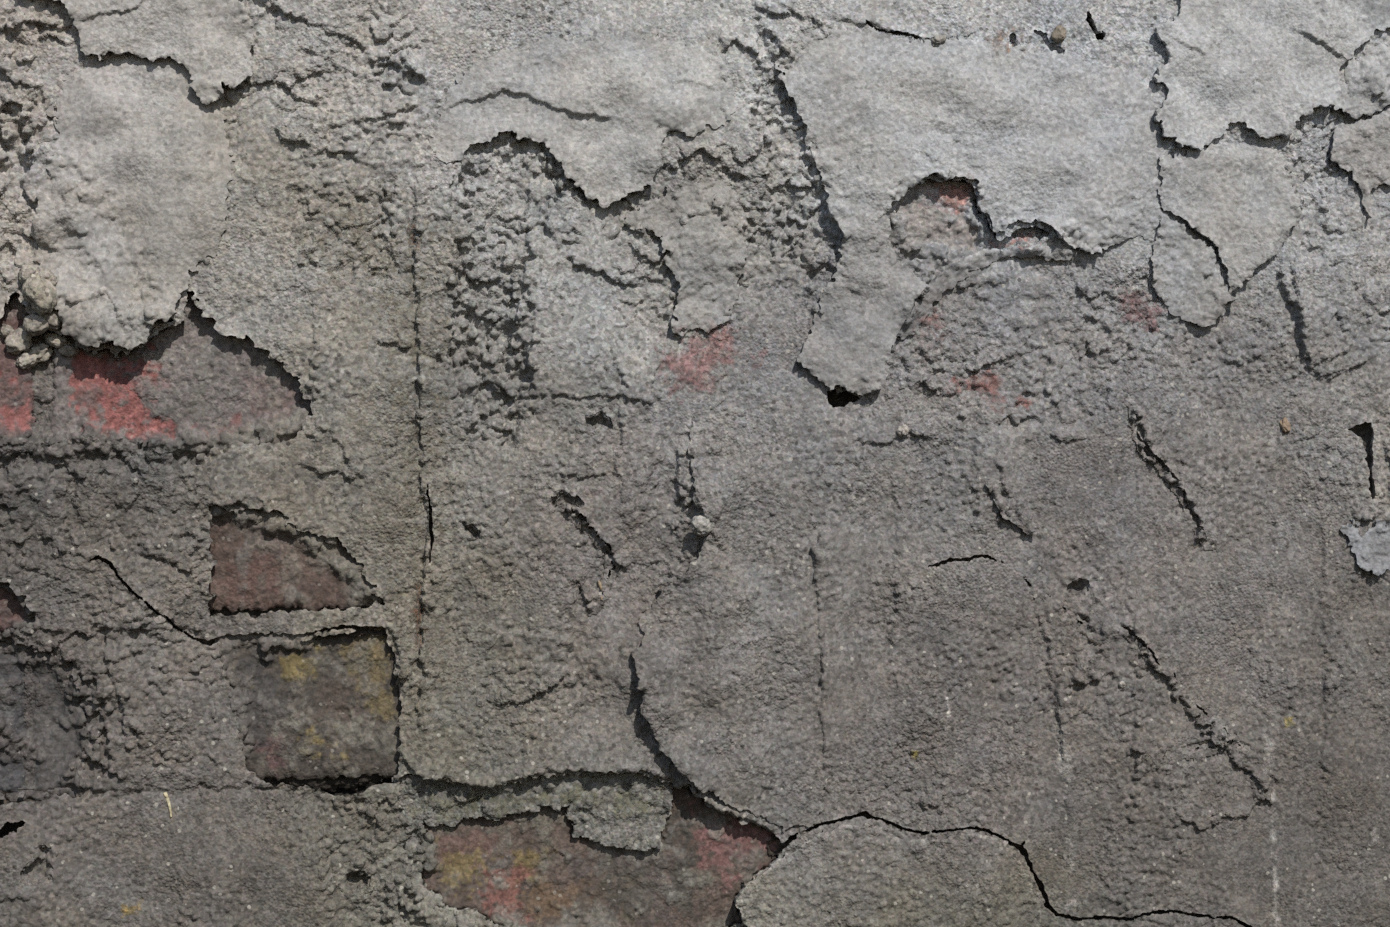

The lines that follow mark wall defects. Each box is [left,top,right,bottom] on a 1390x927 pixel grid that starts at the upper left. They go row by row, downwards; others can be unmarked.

peeling [0,0,313,460]
peeling [429,30,749,337]
peeling [772,0,1390,395]
flaking render [0,582,99,802]
flaking render [208,505,783,927]
crack [767,811,1253,927]
crack [928,554,1251,764]